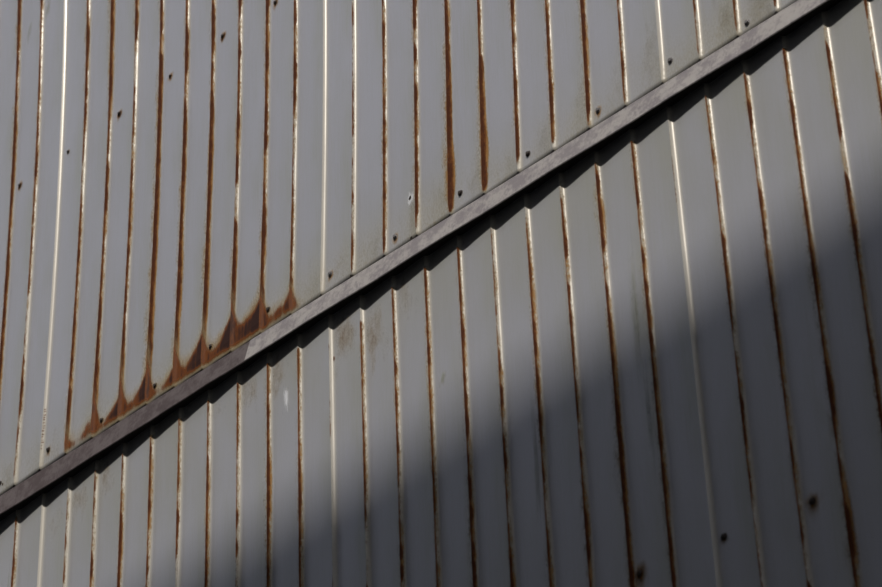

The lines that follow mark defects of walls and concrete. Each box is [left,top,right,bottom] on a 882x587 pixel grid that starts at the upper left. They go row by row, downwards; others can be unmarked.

rust [64,0,91,452]
rust [82,0,298,438]
rust [391,288,405,587]
rust [424,267,441,587]
rust [457,247,478,587]
rust [525,217,554,587]
rust [560,192,593,587]
rust [595,163,644,587]
rust [631,141,676,587]
rust [743,72,817,587]
rust [782,48,860,587]
rust [824,29,882,431]